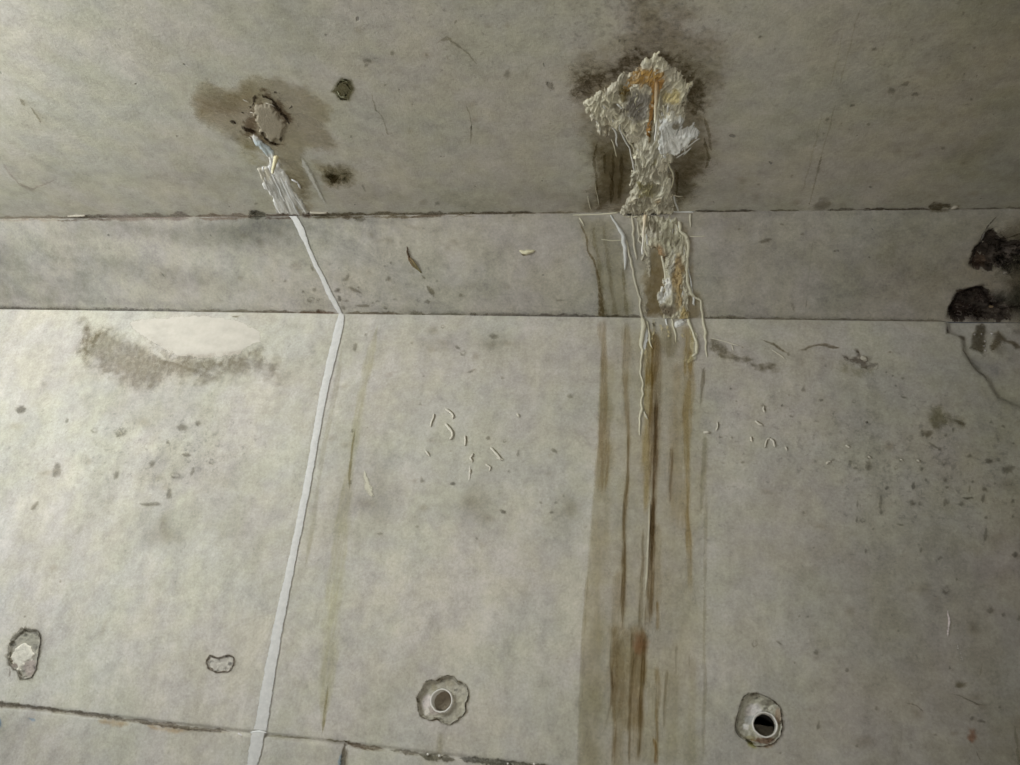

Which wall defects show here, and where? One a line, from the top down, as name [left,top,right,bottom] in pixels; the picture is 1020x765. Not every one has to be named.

damp [575,51,708,435]